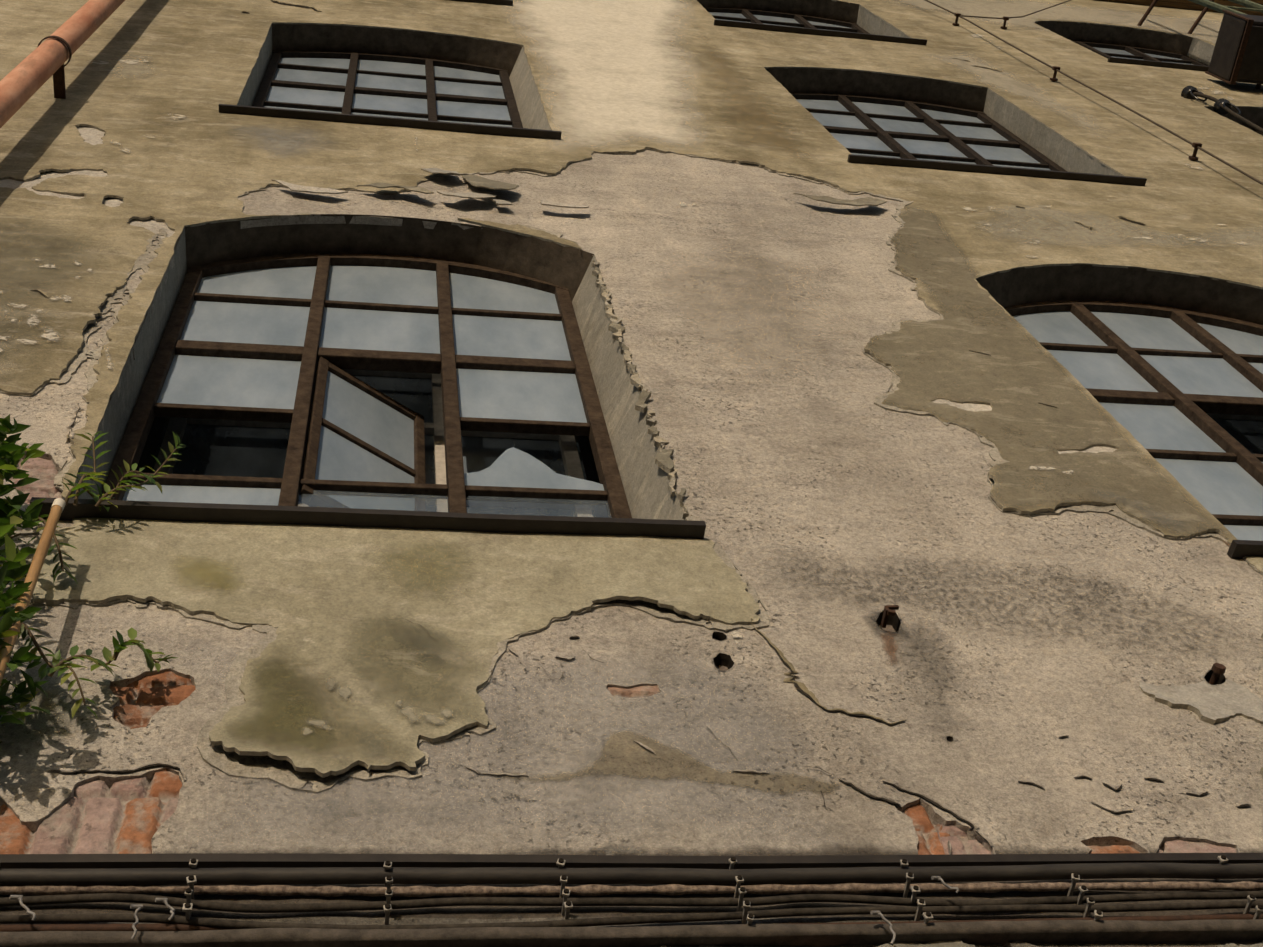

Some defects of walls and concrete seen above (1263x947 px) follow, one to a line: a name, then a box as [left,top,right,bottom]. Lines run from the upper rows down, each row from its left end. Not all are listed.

leakage [514,0,697,144]
flaking render [76,127,130,152]
flaking render [0,149,1263,855]
crack [751,618,906,725]
flaking render [223,917,1041,927]